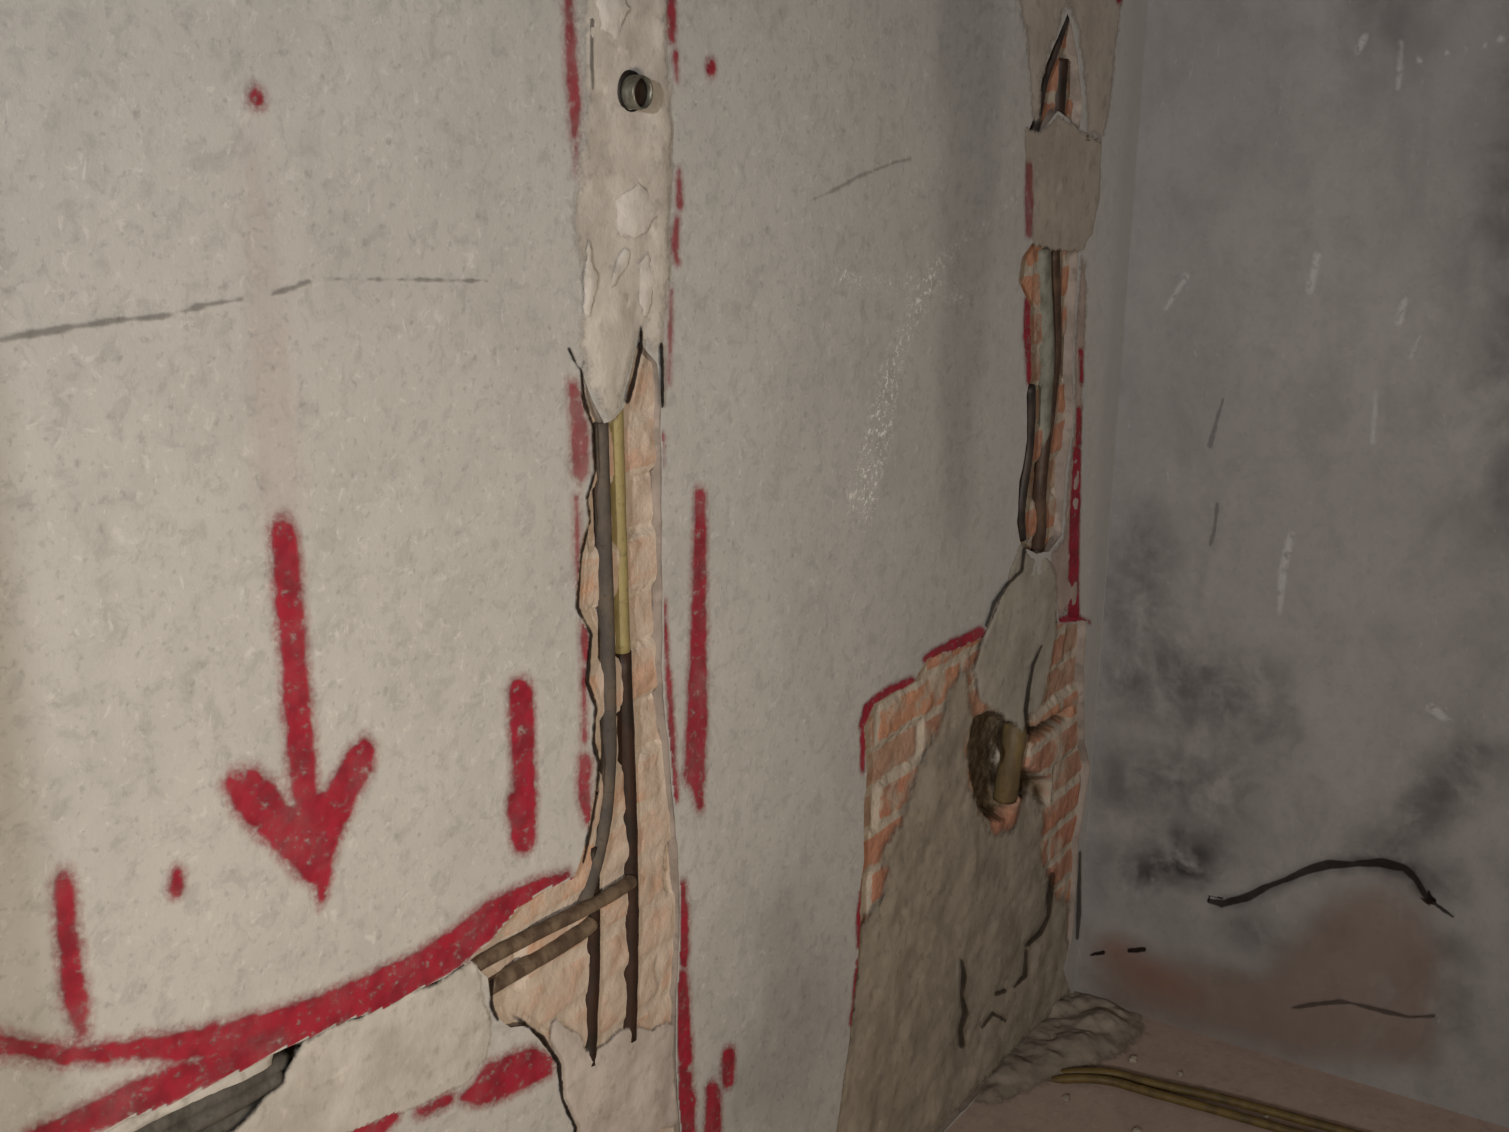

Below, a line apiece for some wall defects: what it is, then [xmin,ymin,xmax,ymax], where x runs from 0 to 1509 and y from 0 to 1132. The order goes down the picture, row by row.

peeling [615,183,658,238]
peeling [583,241,598,317]
peeling [638,254,656,317]
flaking render [1018,243,1078,554]
flaking render [421,342,680,1132]
flaking render [859,597,1090,993]
crack [1207,858,1454,917]